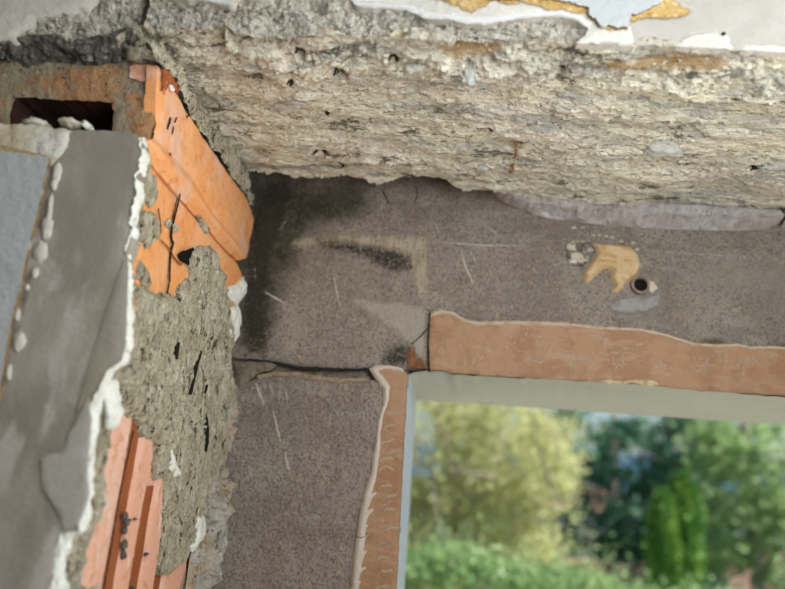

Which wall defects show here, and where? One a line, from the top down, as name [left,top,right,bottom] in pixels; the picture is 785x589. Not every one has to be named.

crack [140,0,151,25]
spalling [0,0,785,69]
spalling [161,67,180,94]
peeling [403,64,427,76]
peeling [0,123,72,166]
flaking render [643,140,684,158]
crack [158,194,182,294]
spalling [178,247,195,265]
flaking render [41,137,152,589]